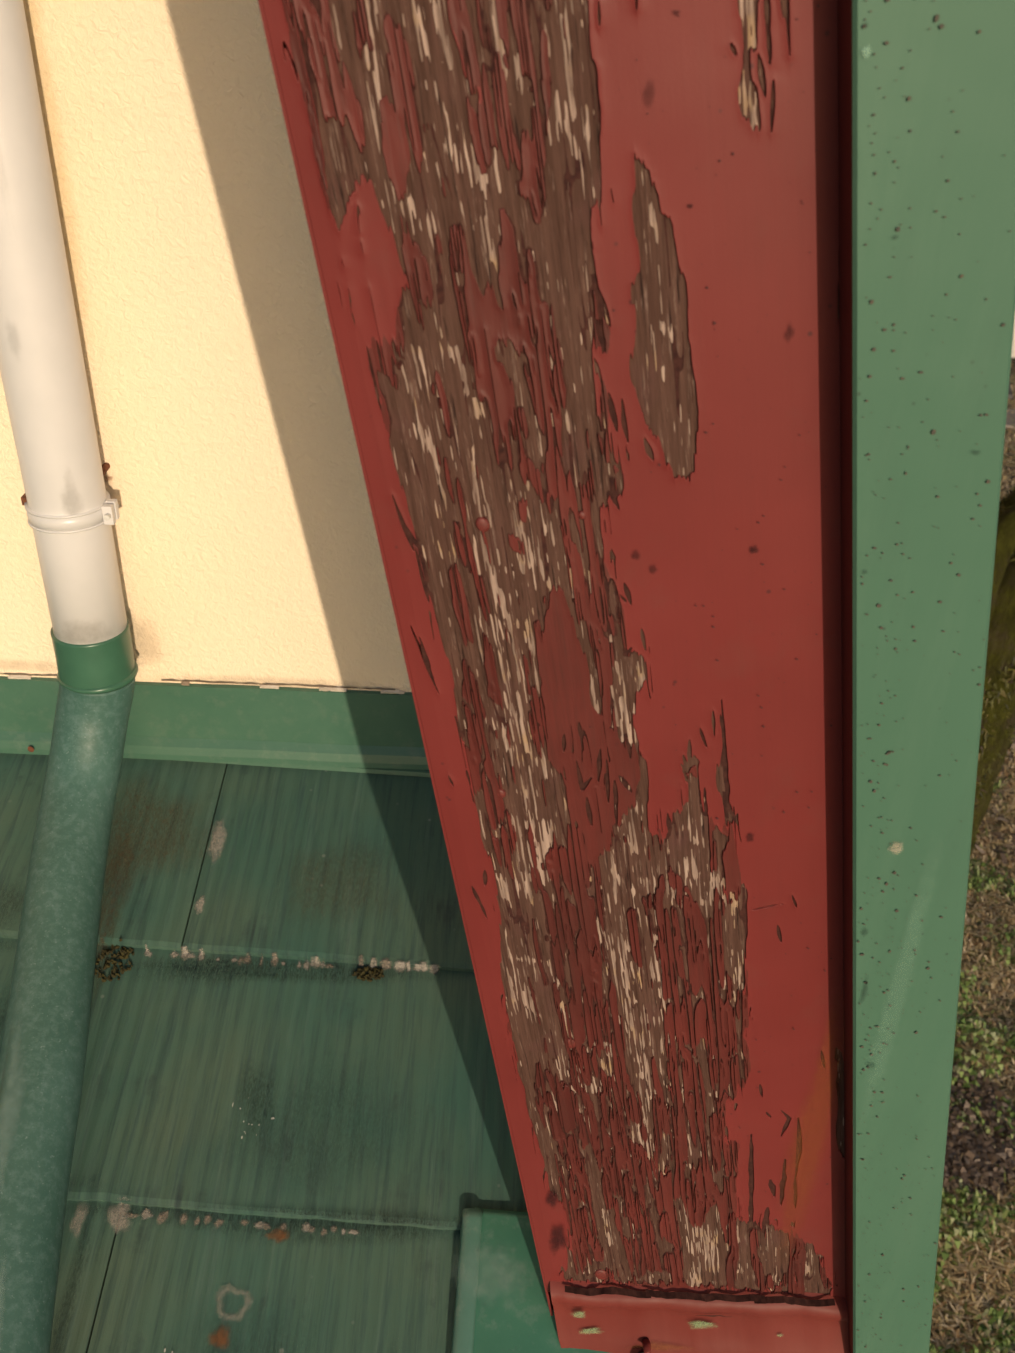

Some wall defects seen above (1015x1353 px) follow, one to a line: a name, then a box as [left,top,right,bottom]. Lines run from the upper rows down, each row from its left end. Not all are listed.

peeling [285,0,837,1294]
peeling [835,1047,844,1157]